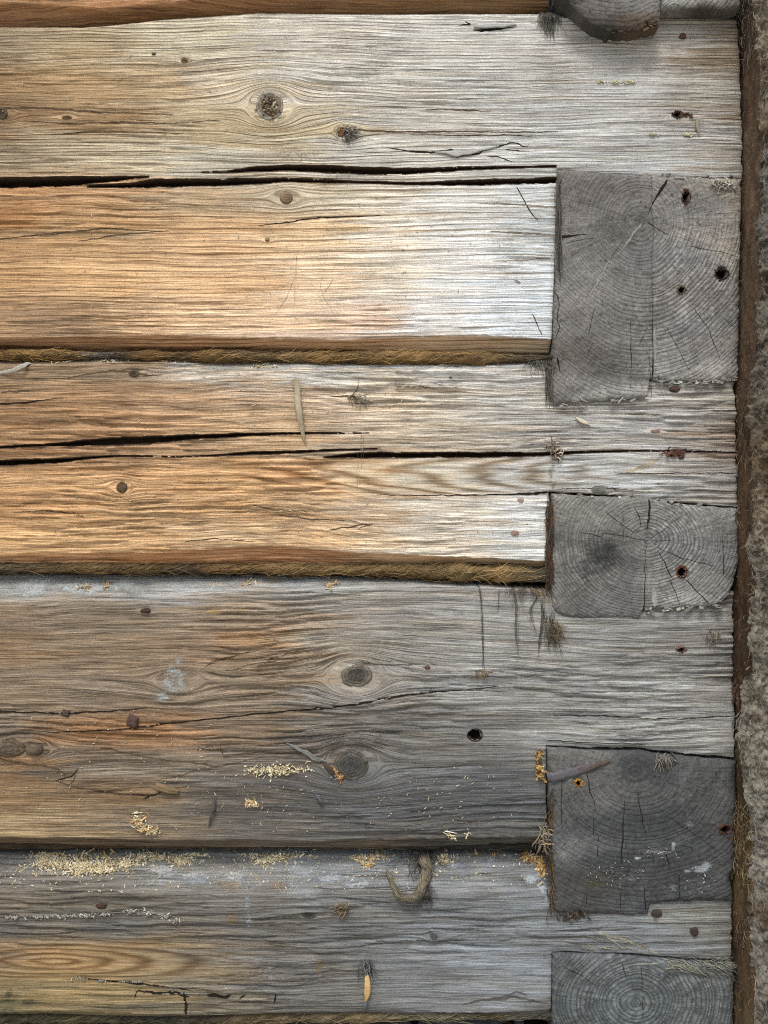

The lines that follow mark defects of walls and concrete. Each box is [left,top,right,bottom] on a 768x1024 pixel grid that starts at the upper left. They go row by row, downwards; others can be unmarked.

crack [0,107,589,283]
crack [645,180,669,235]
crack [630,318,689,397]
rust [659,446,687,460]
crack [0,432,736,611]
crack [0,683,511,799]
crack [556,773,723,1006]